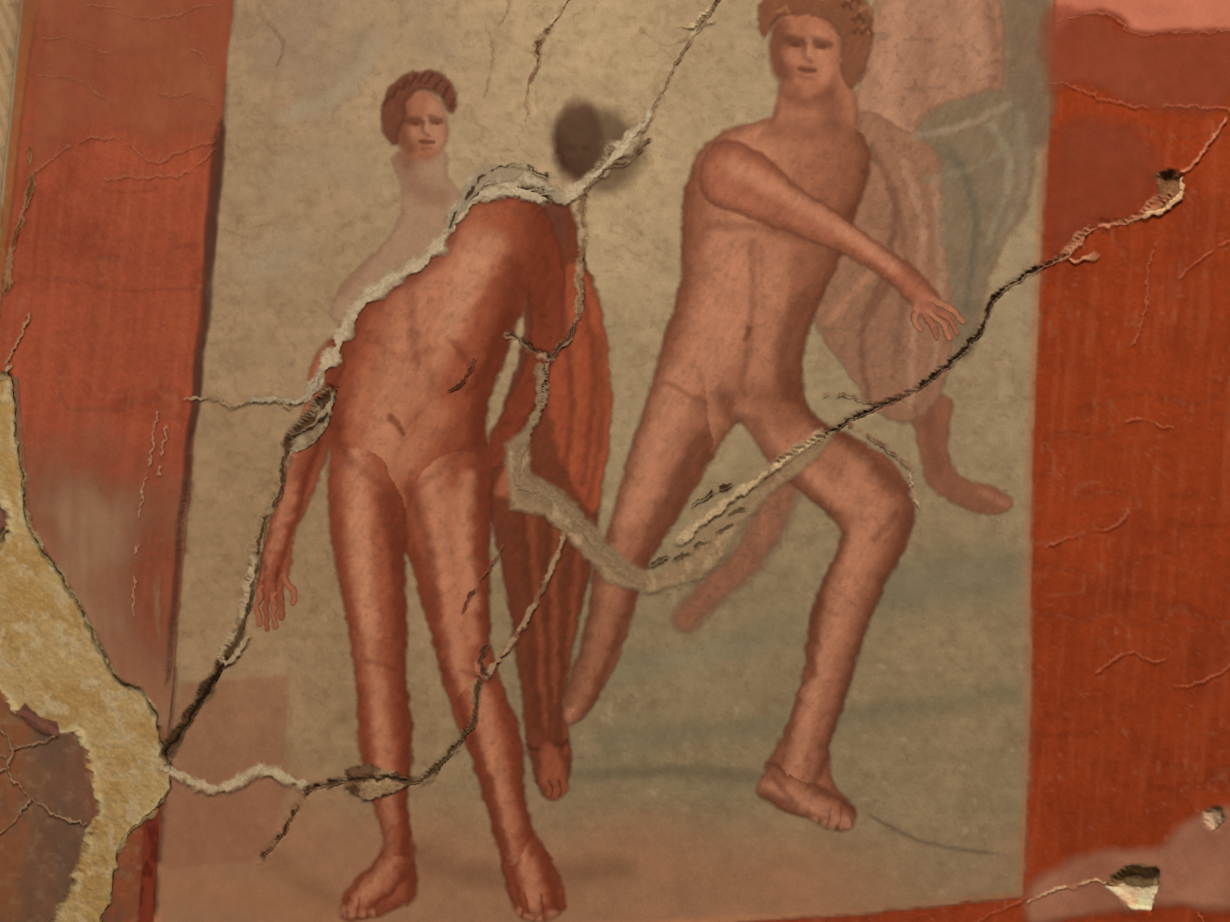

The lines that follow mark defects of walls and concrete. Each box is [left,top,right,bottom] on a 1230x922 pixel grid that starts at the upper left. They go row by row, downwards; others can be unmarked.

spalling [449,164,524,220]
crack [448,161,549,228]
water stain [561,116,635,184]
crack [506,0,719,406]
spalling [1142,177,1185,218]
crack [782,117,1227,469]
crack [159,390,331,761]
spalling [650,506,746,566]
flaking render [0,371,171,922]
crack [260,532,566,860]
crack [0,726,87,834]
spalling [1027,863,1160,910]